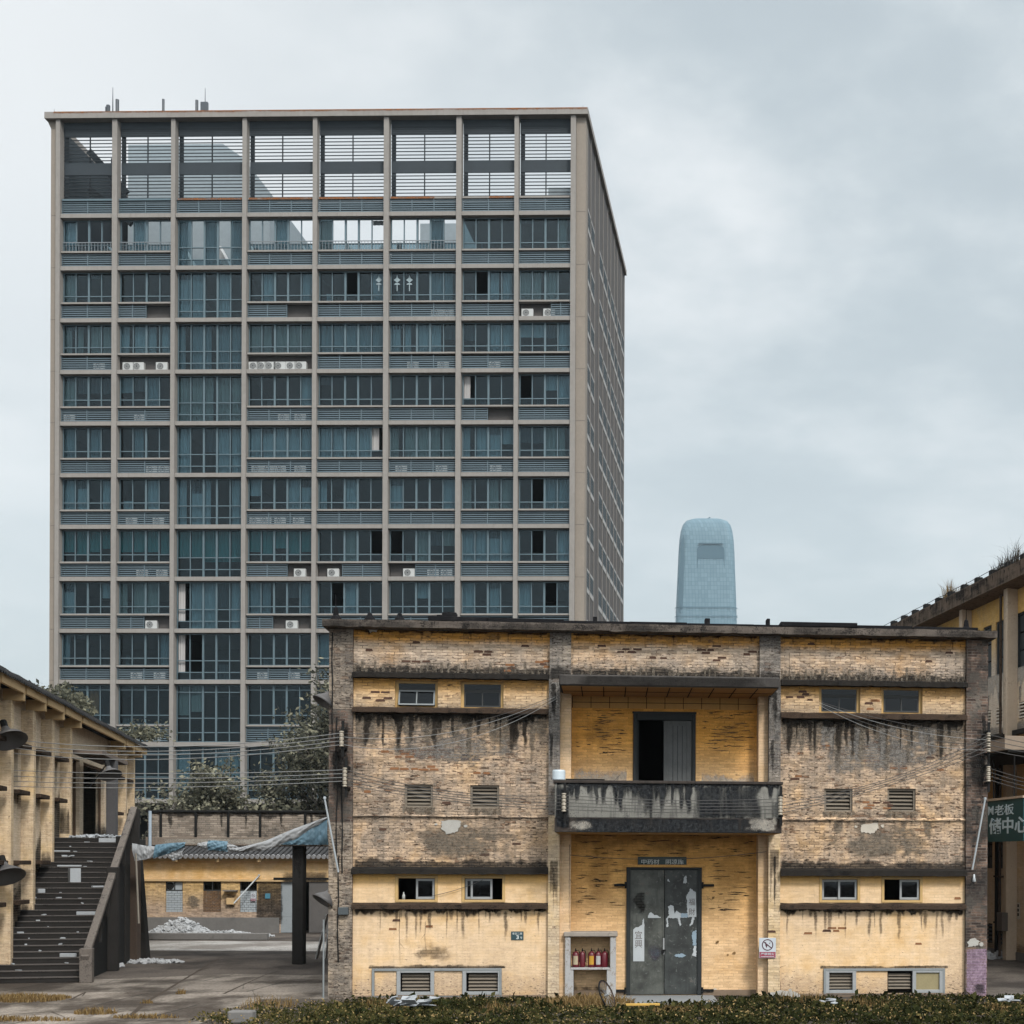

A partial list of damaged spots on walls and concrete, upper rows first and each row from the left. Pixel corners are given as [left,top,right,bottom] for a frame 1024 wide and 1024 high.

damp [331,660,963,788]
damp [569,771,627,808]
damp [641,775,749,812]
flaking render [434,820,467,834]
flaking render [854,823,884,834]
damp [770,852,964,931]
damp [355,909,546,931]